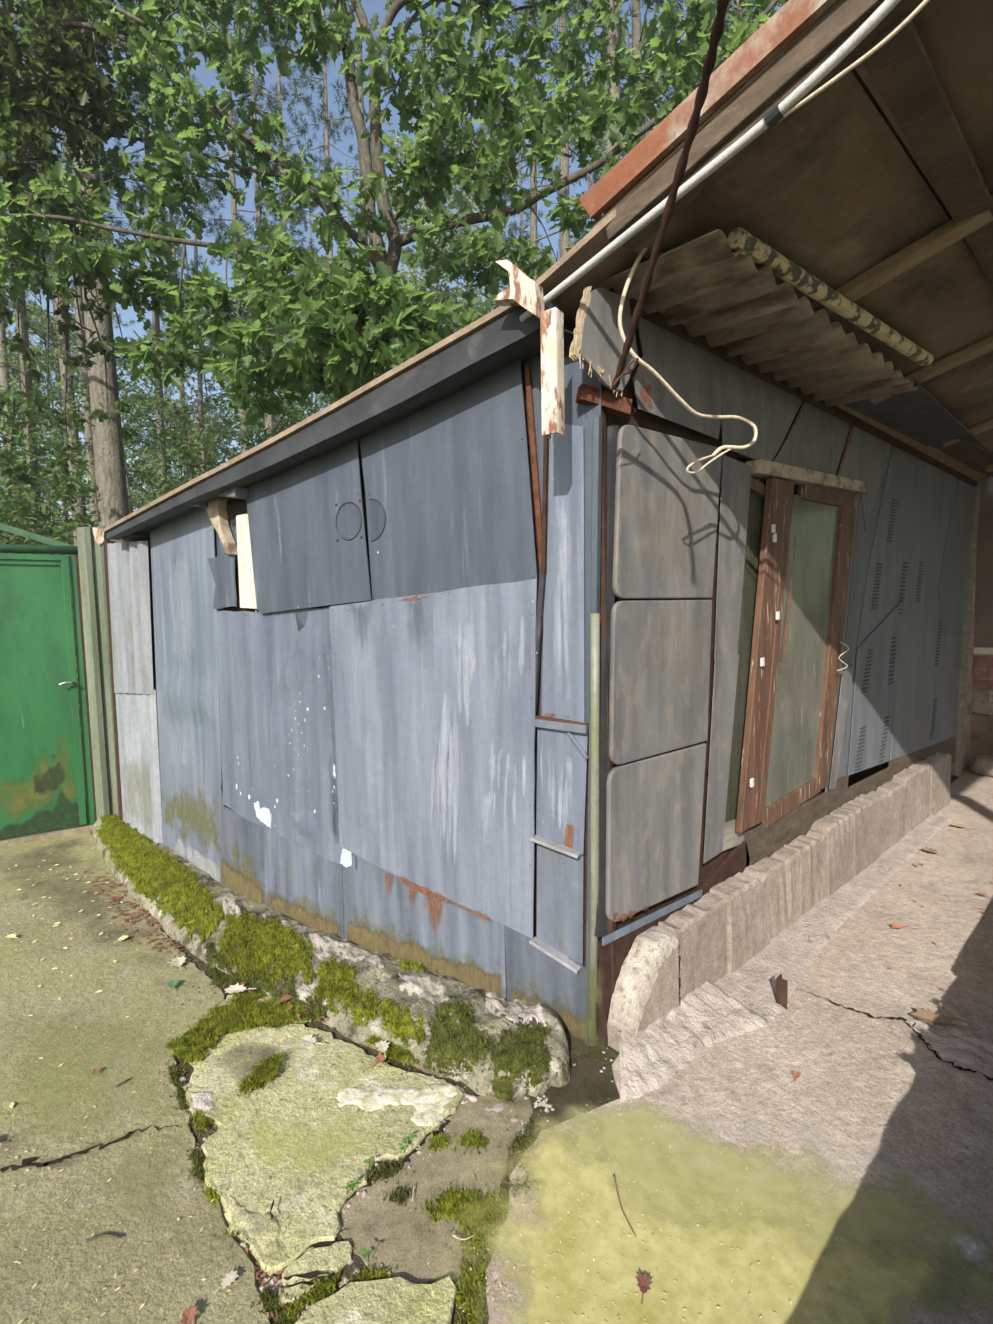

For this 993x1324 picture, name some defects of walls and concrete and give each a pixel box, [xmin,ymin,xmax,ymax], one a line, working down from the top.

corrosion [579,0,837,222]
leakage [0,763,85,865]
peeling [236,784,278,828]
peeling [340,848,352,868]
corrosion [386,874,489,930]
crack [797,989,993,1081]
crack [0,1124,184,1173]